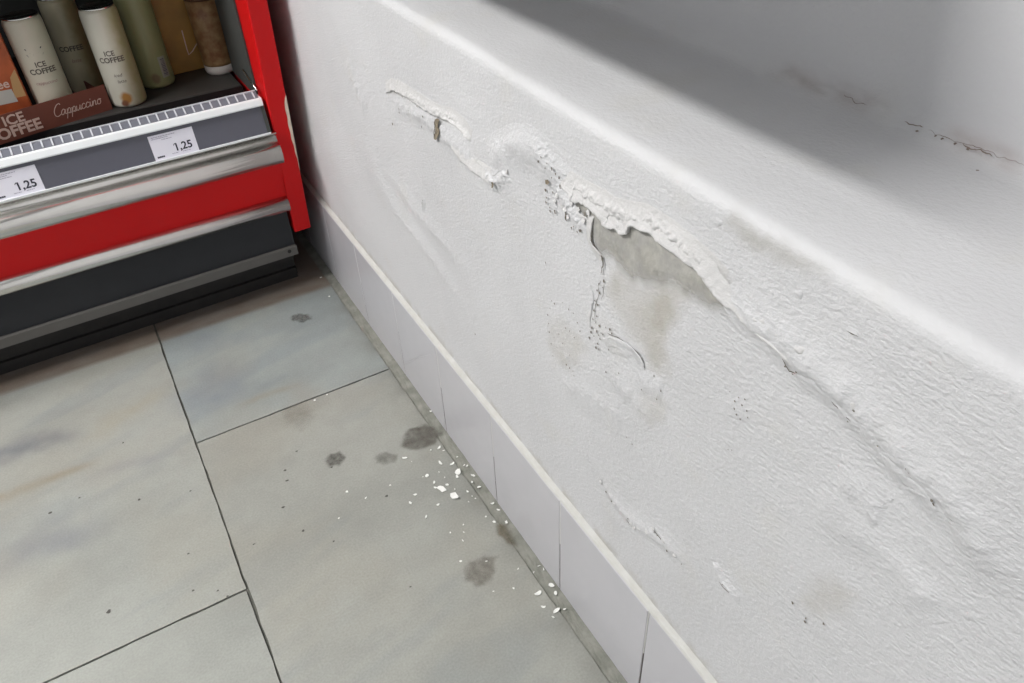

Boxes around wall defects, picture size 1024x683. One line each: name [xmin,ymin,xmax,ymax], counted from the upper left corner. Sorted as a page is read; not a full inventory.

crack [905,121,1021,171]
crack [586,233,612,350]
spalling [545,171,748,329]